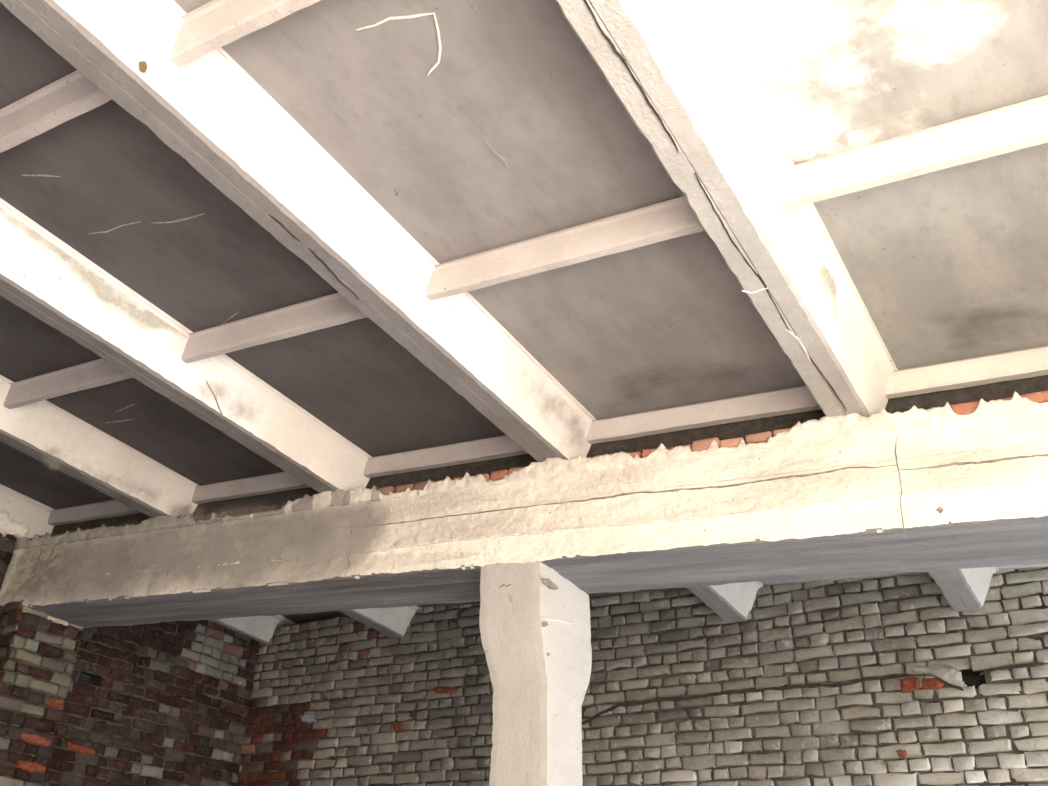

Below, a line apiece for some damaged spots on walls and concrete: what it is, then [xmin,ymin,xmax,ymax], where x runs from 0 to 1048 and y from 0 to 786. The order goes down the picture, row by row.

crack [584,0,678,152]
leakage [710,0,875,160]
leakage [880,0,995,64]
crack [268,214,359,300]
crack [695,173,847,412]
crack [344,438,1048,577]